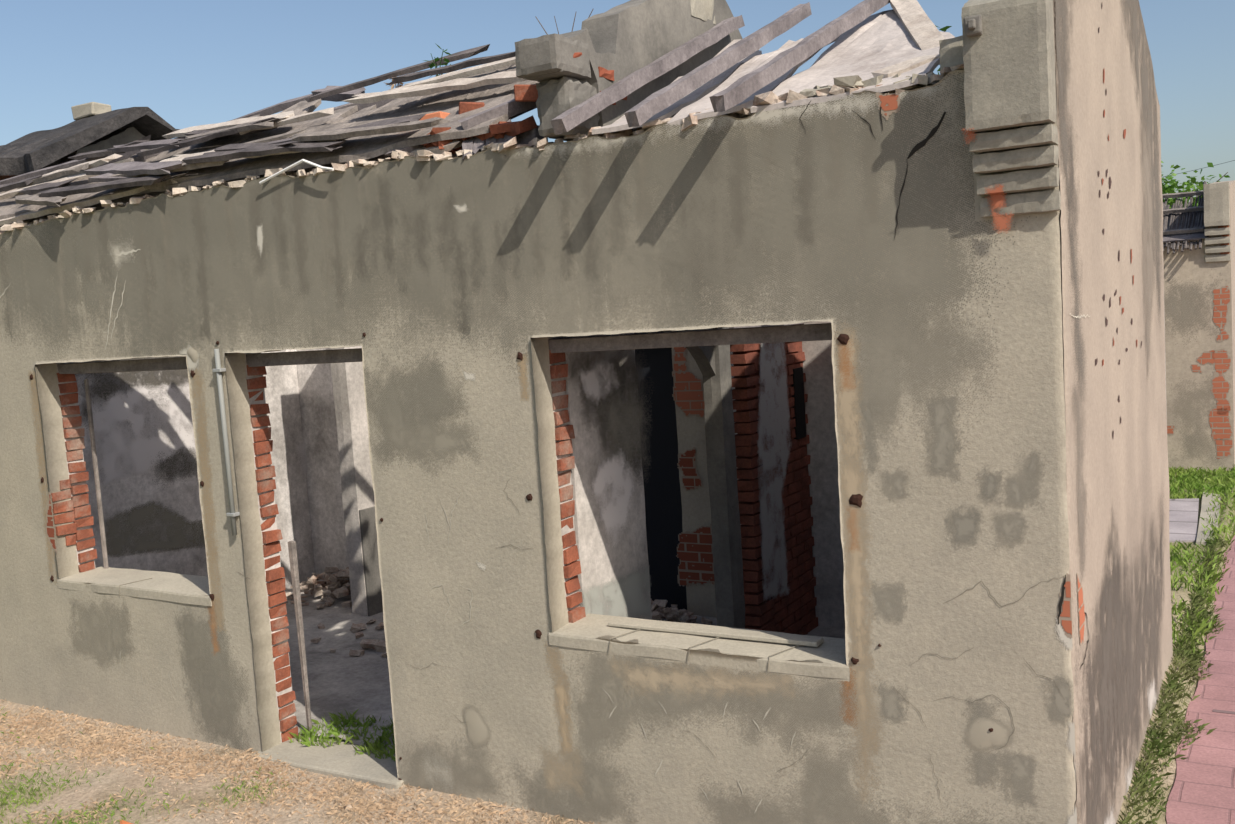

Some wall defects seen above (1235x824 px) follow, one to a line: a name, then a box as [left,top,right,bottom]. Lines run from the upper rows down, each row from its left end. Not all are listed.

peeling [499,83,944,162]
crack [853,92,888,138]
crack [894,111,946,239]
peeling [85,345,200,488]
water stain [0,71,1046,551]
flaking render [1191,285,1233,460]
peeling [104,501,205,558]
water stain [397,651,1044,824]
corrosion [834,320,885,804]
crack [894,647,1015,801]
crack [943,575,1089,698]
water stain [1041,475,1167,824]